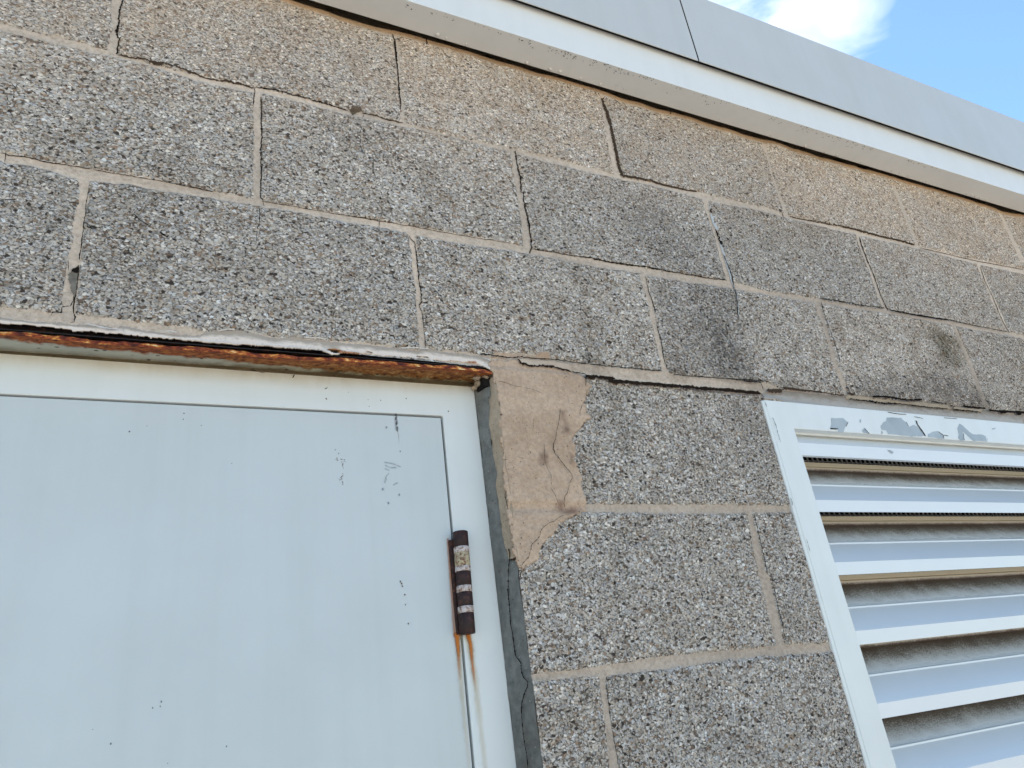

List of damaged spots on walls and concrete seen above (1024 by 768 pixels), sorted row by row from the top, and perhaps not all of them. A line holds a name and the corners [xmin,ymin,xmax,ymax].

spalling [68,265,79,299]
peeling [520,358,572,371]
crack [480,98,1024,766]
peeling [830,412,996,442]
rust [448,554,474,676]